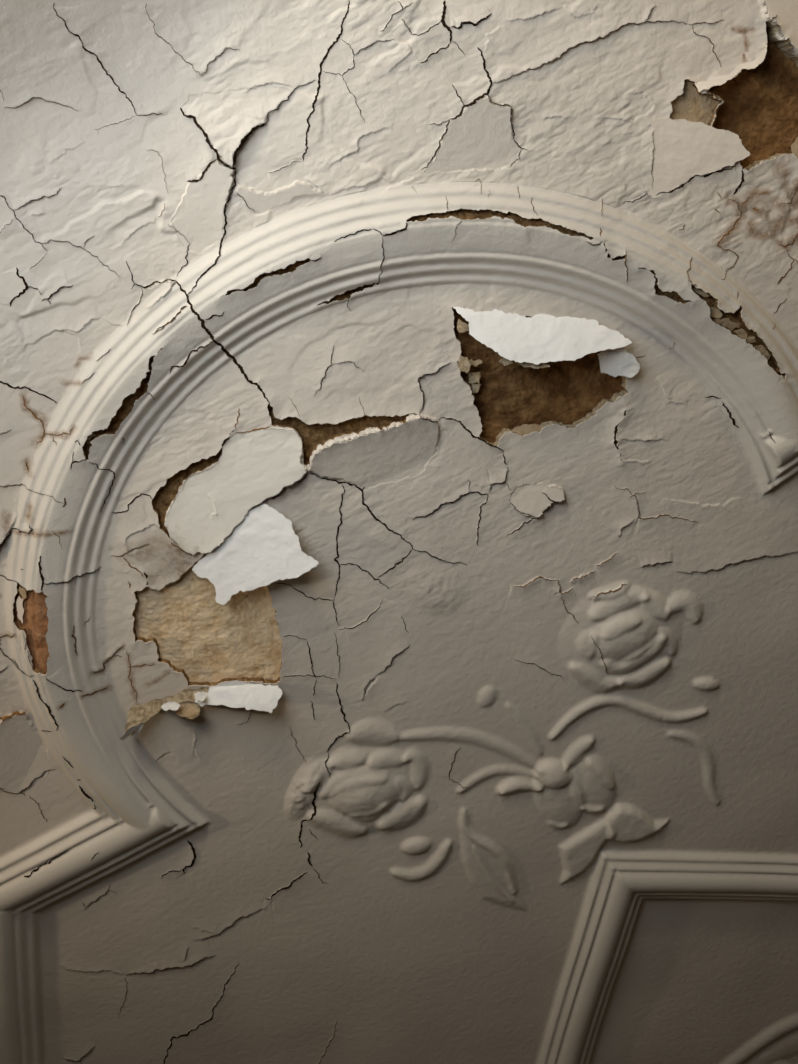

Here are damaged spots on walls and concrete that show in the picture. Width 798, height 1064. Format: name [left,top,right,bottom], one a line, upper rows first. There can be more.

crack [424,6,724,168]
spalling [651,21,798,198]
crack [318,166,798,382]
crack [0,1,563,1012]
spalling [451,307,640,446]
crack [614,410,627,462]
crack [617,488,696,522]
crack [706,396,739,428]
spalling [13,583,50,675]
spalling [120,503,319,741]
crack [512,554,627,675]
crack [163,964,239,1064]